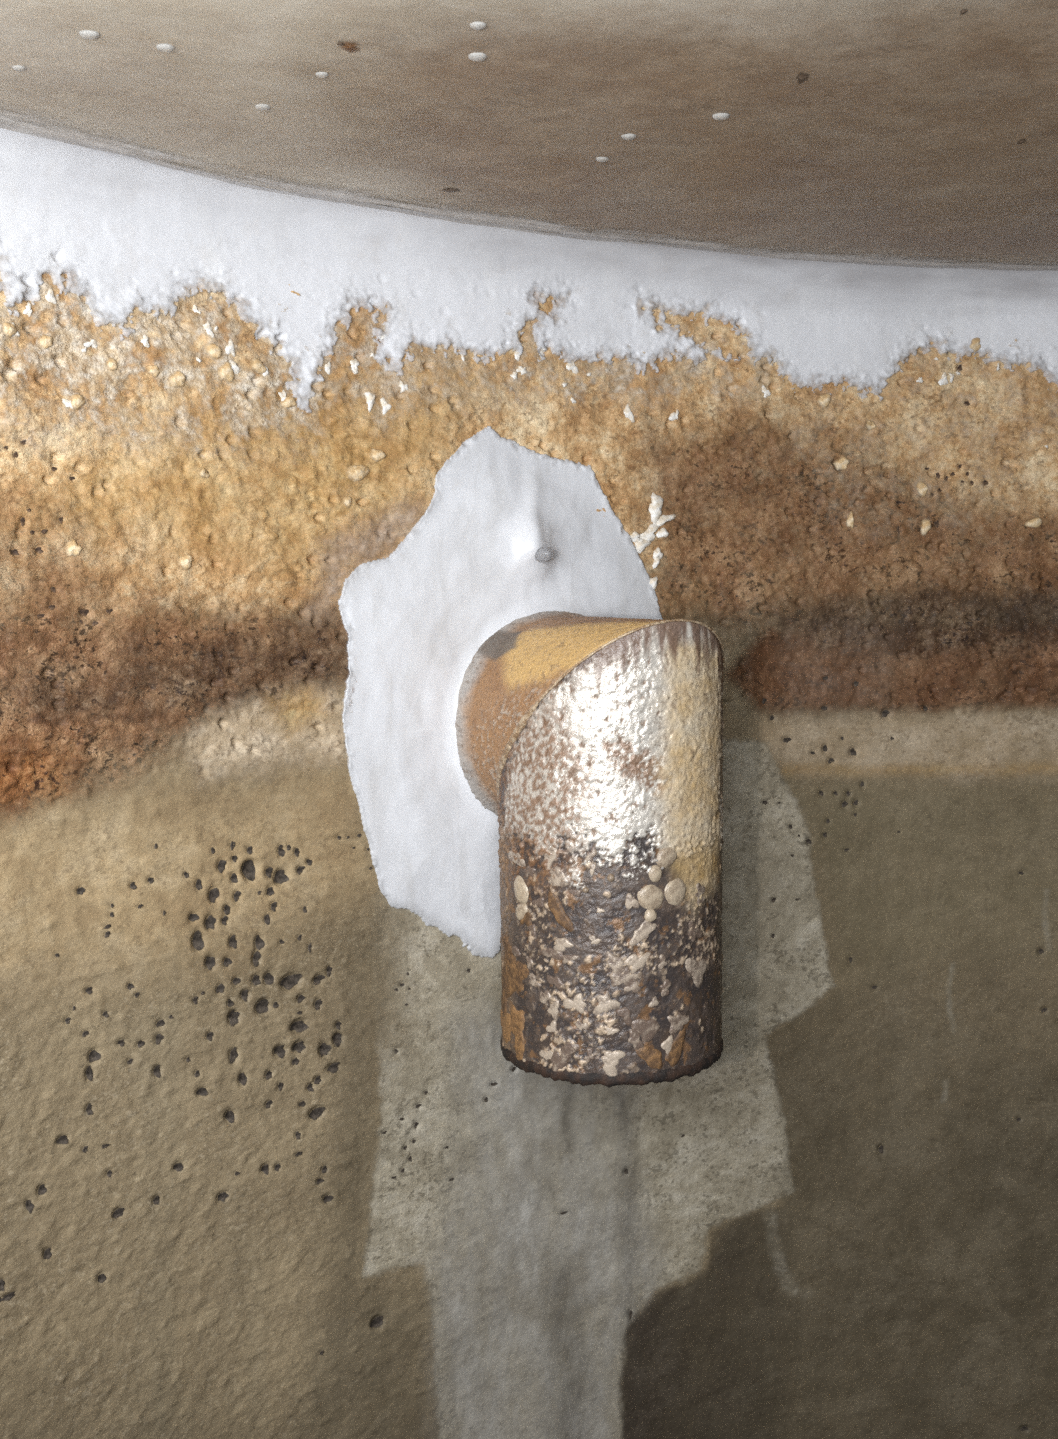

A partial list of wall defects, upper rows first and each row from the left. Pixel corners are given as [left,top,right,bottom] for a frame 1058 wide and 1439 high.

water stain [387,0,1058,259]
water stain [0,273,730,440]
water stain [31,623,349,712]
rust [0,256,1058,804]
water stain [785,590,1058,654]
water stain [364,715,1058,1439]